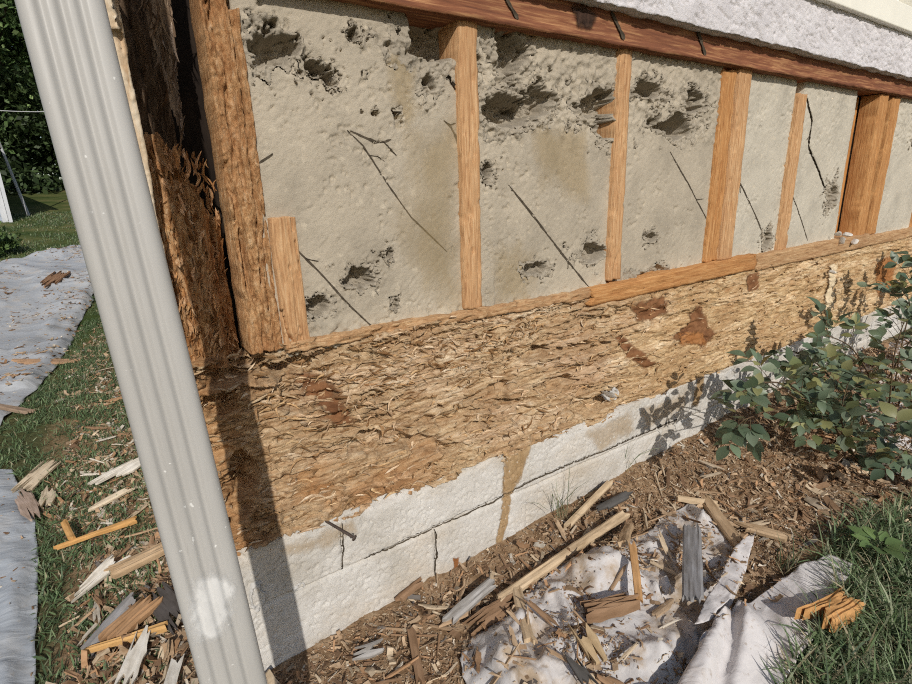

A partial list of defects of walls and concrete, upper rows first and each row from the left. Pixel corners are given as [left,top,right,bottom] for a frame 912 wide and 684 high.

spalling [235,9,347,95]
spalling [341,11,456,111]
spalling [480,159,499,189]
spalling [476,28,616,155]
spalling [629,71,715,150]
crack [807,98,826,188]
spalling [822,169,841,218]
spalling [305,244,395,321]
spalling [513,228,607,283]
spalling [642,226,661,249]
spalling [757,222,777,253]
water stain [496,492,512,543]